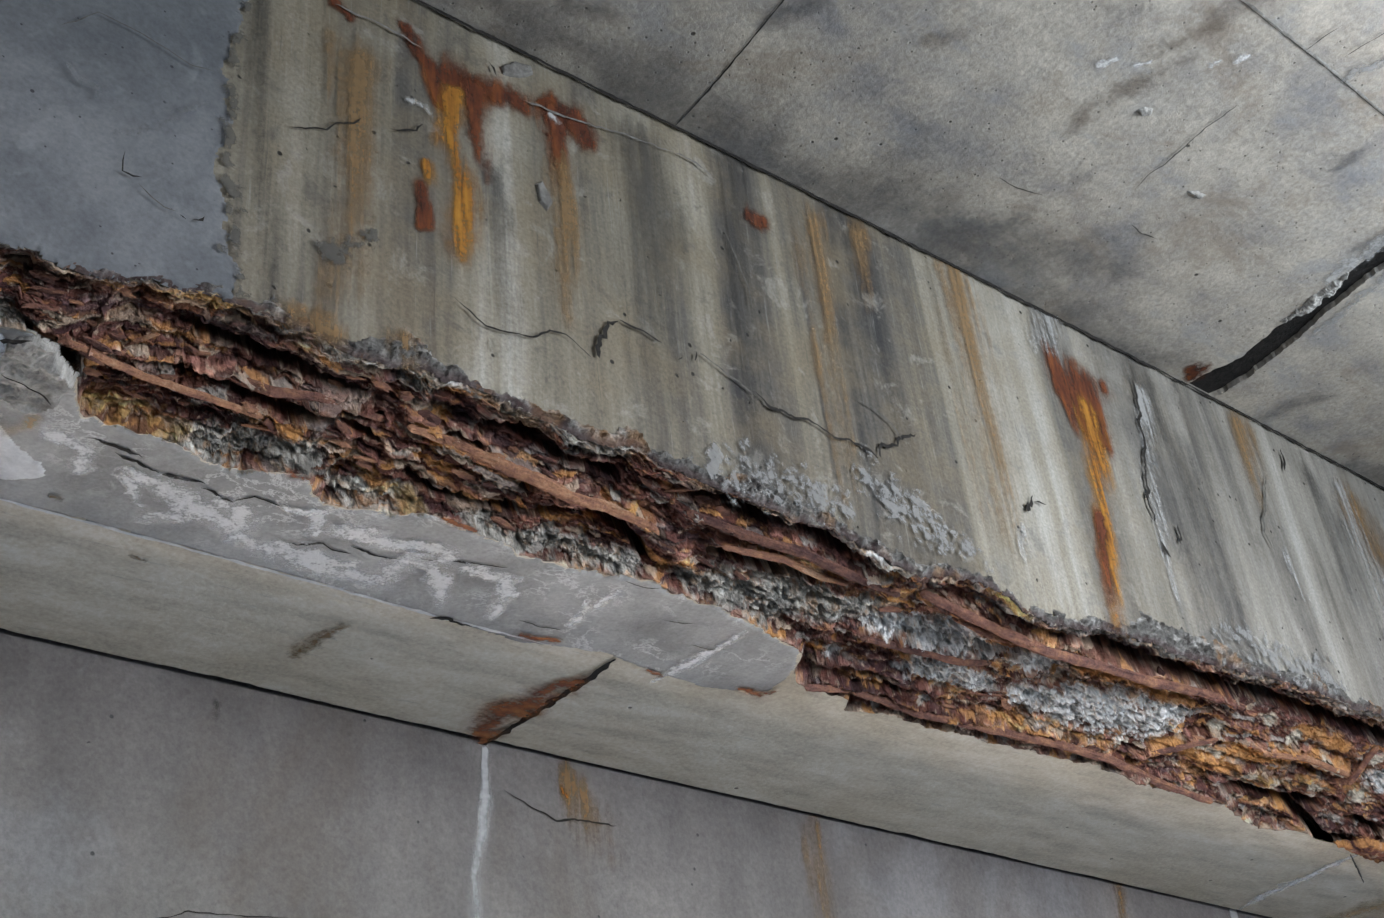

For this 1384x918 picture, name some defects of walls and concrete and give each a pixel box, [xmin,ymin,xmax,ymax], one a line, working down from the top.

corrosion [399,21,598,321]
spalling [535,181,553,211]
spalling [1135,107,1153,116]
damp [41,430,95,475]
damp [115,466,521,620]
crack [455,298,916,458]
spalling [0,222,1384,863]
corrosion [1044,344,1122,625]
corrosion [469,679,586,745]
damp [652,632,744,682]
damp [471,746,491,918]
crack [159,910,288,918]